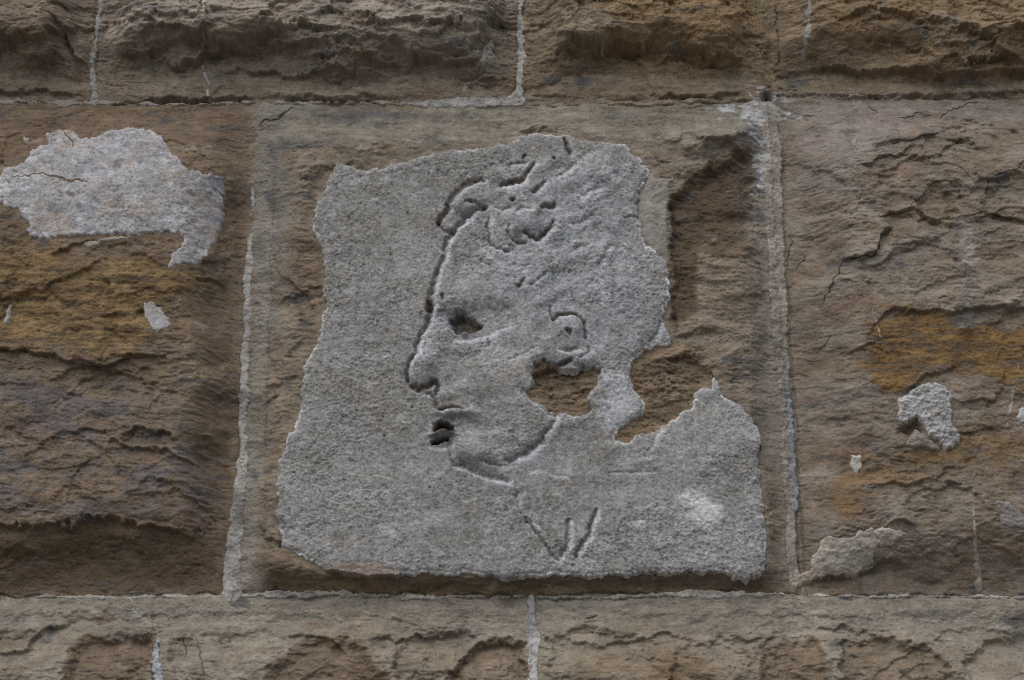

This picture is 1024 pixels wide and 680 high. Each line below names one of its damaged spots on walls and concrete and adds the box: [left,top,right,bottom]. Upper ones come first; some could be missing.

crack [860,102,990,165]
crack [11,172,86,182]
crack [822,160,1024,305]
spalling [615,143,761,443]
spalling [526,361,600,417]